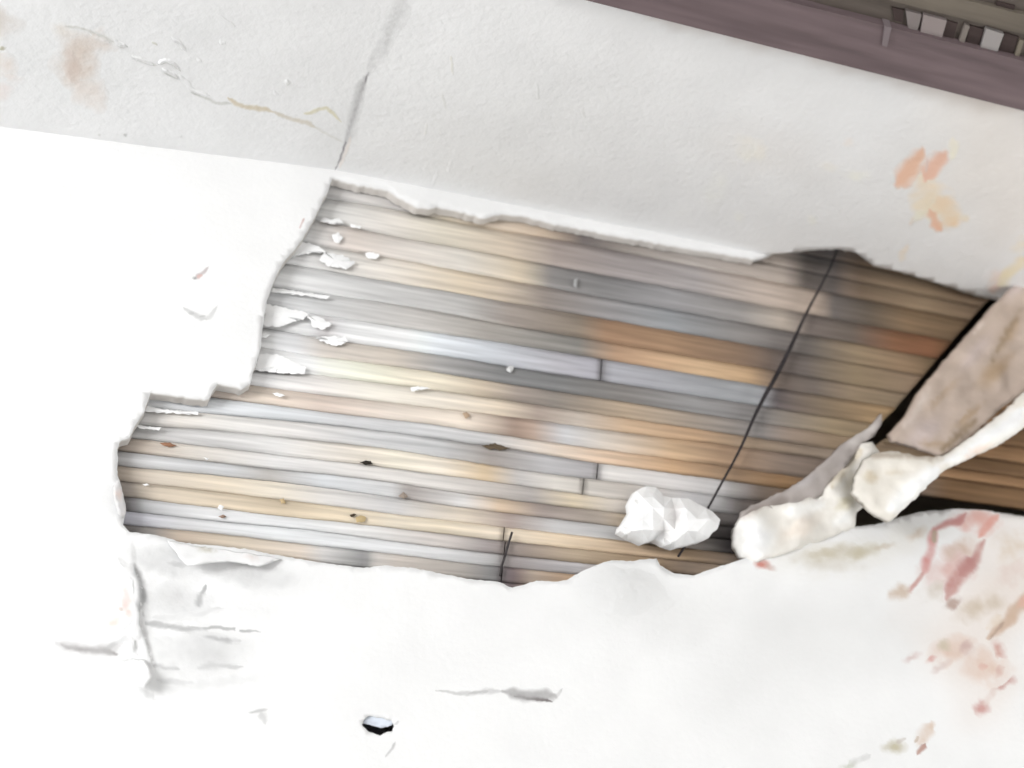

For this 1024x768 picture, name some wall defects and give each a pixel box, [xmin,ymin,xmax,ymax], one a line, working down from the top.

crack [66,0,412,170]
corrosion [892,136,970,233]
spalling [113,177,755,588]
corrosion [882,509,1004,612]
crack [54,563,260,686]
spalling [362,716,399,758]
crack [435,686,563,704]
corrosion [900,591,1024,718]